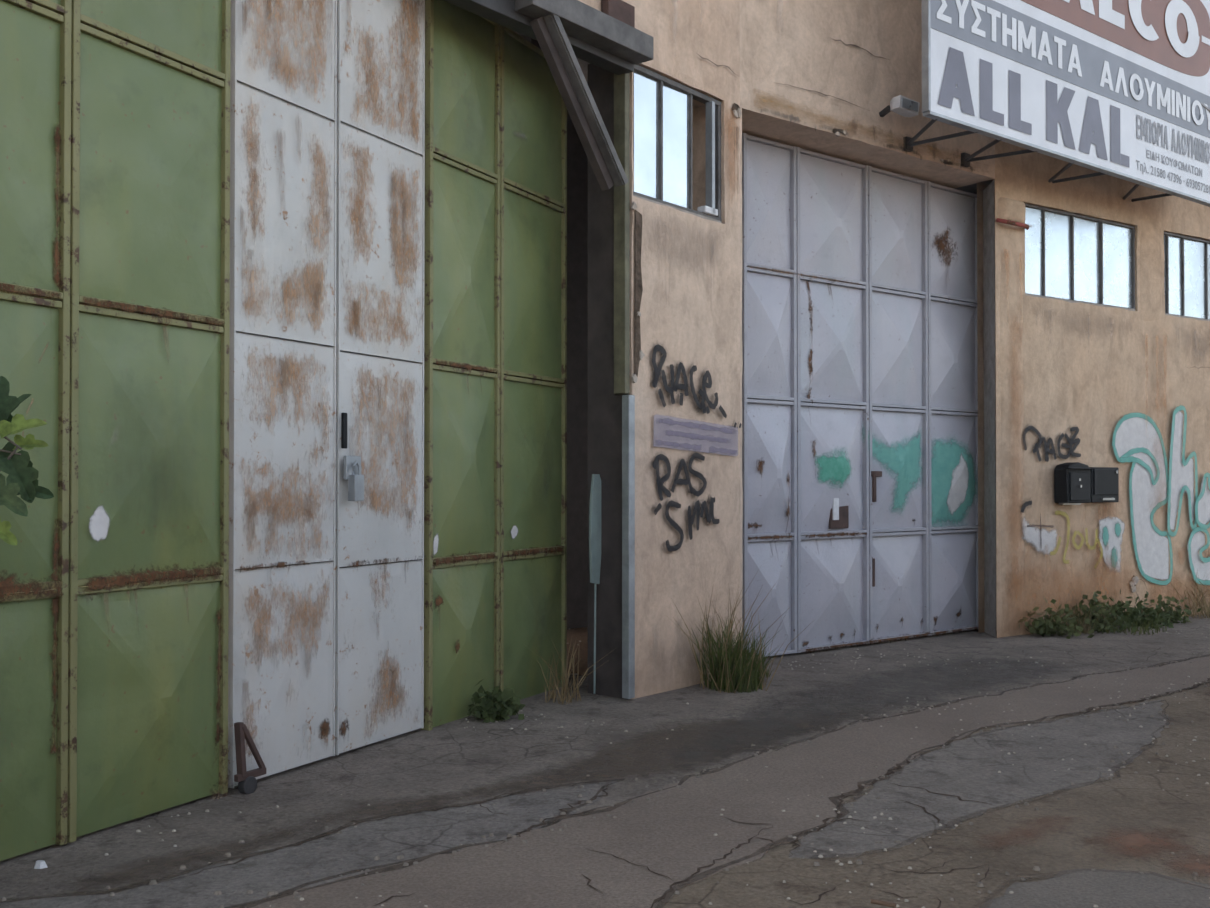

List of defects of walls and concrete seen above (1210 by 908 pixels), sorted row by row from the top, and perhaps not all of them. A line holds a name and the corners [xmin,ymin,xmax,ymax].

rust [244,0,326,93]
rust [353,0,419,139]
crack [831,38,889,60]
rust [83,297,224,325]
rust [281,264,325,331]
rust [347,173,419,341]
rust [932,227,958,265]
rust [355,371,417,516]
rust [240,460,325,571]
rust [86,562,221,595]
rust [0,519,63,753]
rust [320,720,349,738]